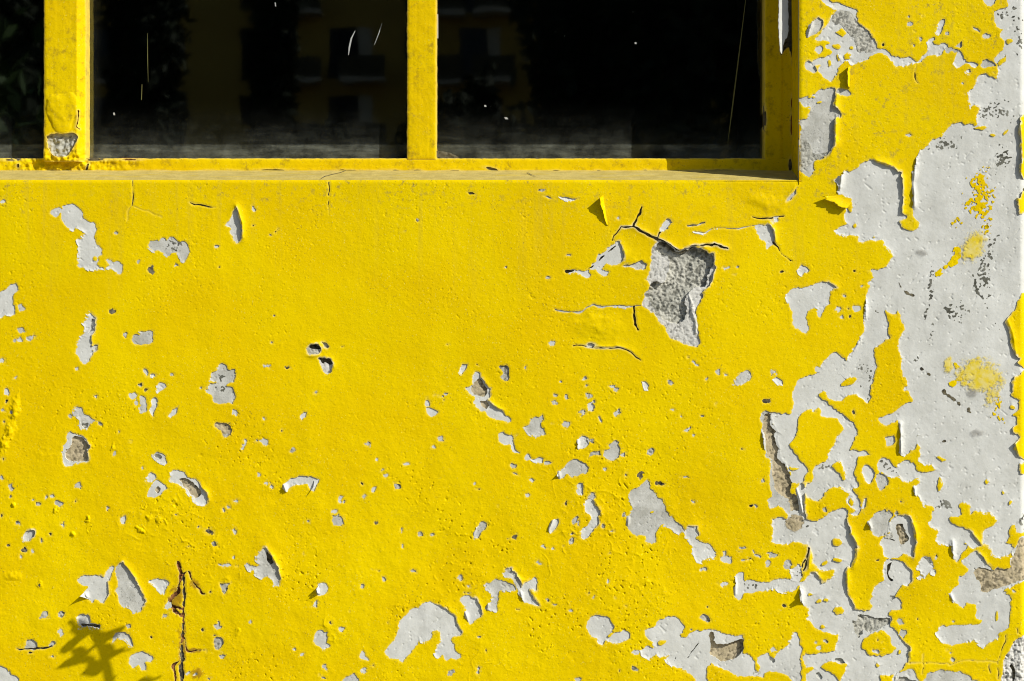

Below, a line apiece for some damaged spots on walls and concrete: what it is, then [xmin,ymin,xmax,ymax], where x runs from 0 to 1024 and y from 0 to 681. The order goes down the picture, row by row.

peeling [47,133,78,157]
peeling [50,203,123,274]
peeling [137,236,190,275]
crack [612,207,784,254]
crack [555,304,641,361]
peeling [565,0,1024,681]
peeling [200,363,238,438]
flaking render [458,364,625,545]
peeling [218,548,281,587]
peeling [39,562,172,670]
peeling [385,568,557,676]